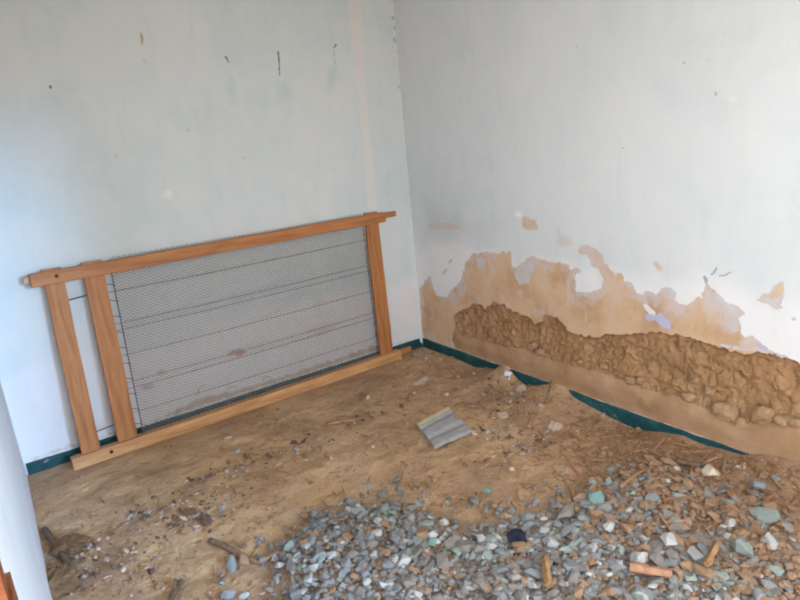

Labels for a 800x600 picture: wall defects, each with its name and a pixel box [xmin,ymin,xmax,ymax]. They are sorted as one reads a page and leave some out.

peeling [513,208,539,232]
peeling [392,242,800,365]
peeling [135,344,379,428]
peeling [28,441,80,462]
peeling [570,389,746,453]